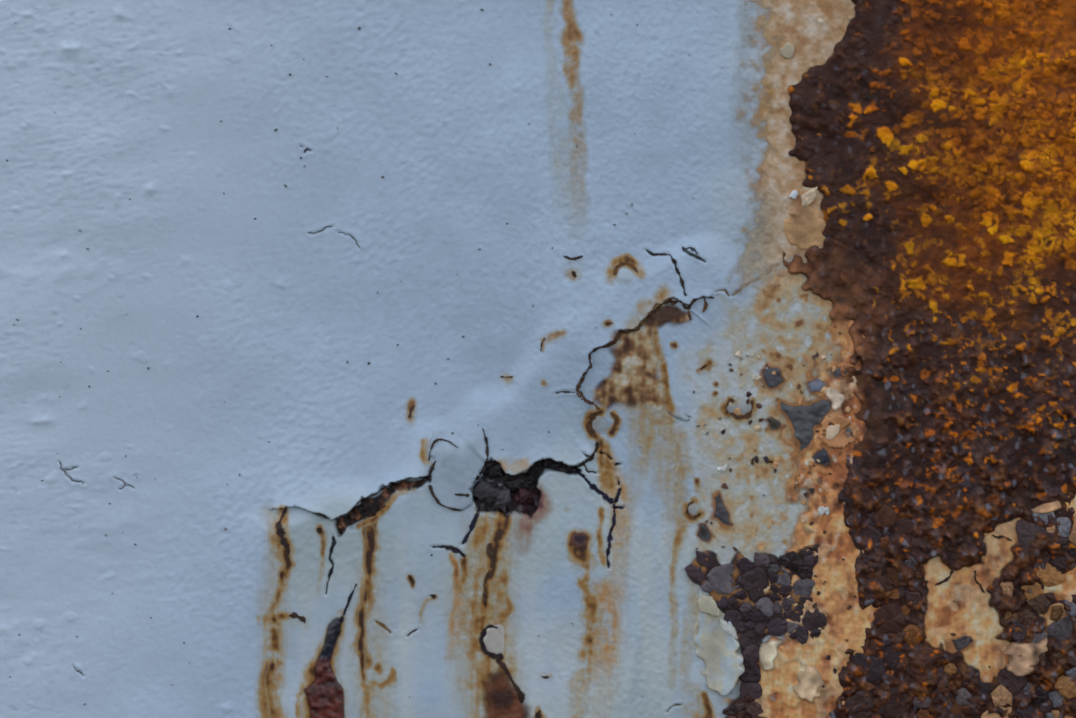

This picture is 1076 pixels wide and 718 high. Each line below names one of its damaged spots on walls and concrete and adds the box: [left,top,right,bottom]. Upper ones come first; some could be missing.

crack [646,246,706,296]
corrosion [670,0,1076,718]
peeling [760,363,848,467]
crack [298,507,336,594]
corrosion [257,505,396,718]
crack [432,508,480,558]
corrosion [449,511,528,718]
corrosion [567,437,629,701]
crack [574,441,624,568]
peeling [696,491,732,542]
peeling [693,594,745,696]
peeling [759,639,783,671]